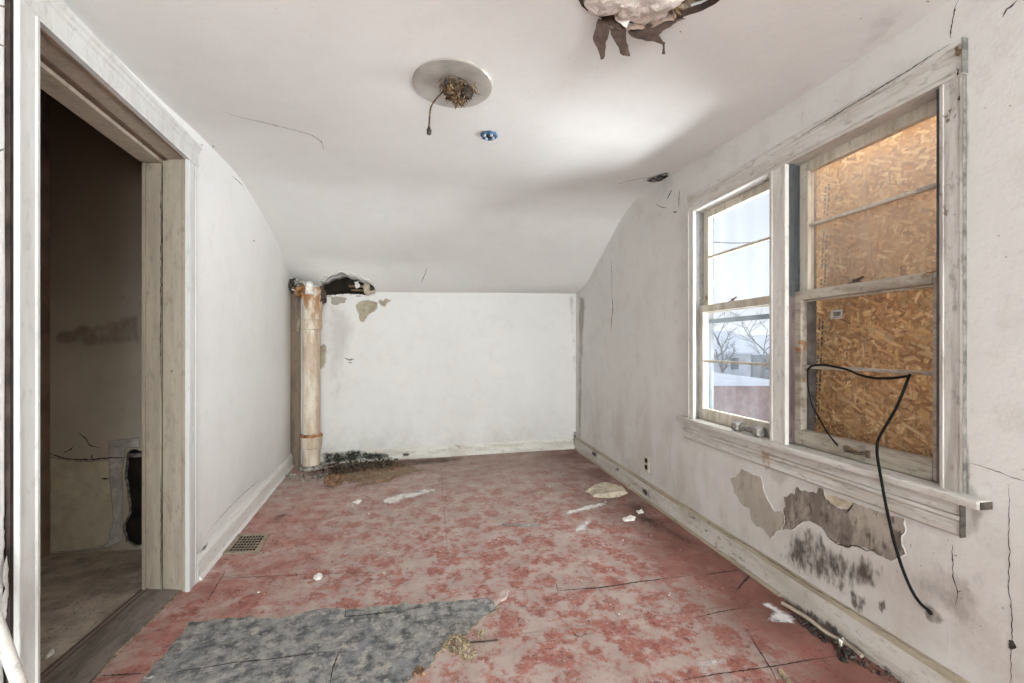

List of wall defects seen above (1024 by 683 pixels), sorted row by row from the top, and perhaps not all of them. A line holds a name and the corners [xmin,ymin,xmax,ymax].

spalling [676,0,720,18]
flaking render [318,270,391,322]
crack [50,433,126,461]
flaking render [123,449,142,547]
flaking render [730,468,907,562]
water stain [791,530,874,611]
crack [971,463,1023,682]